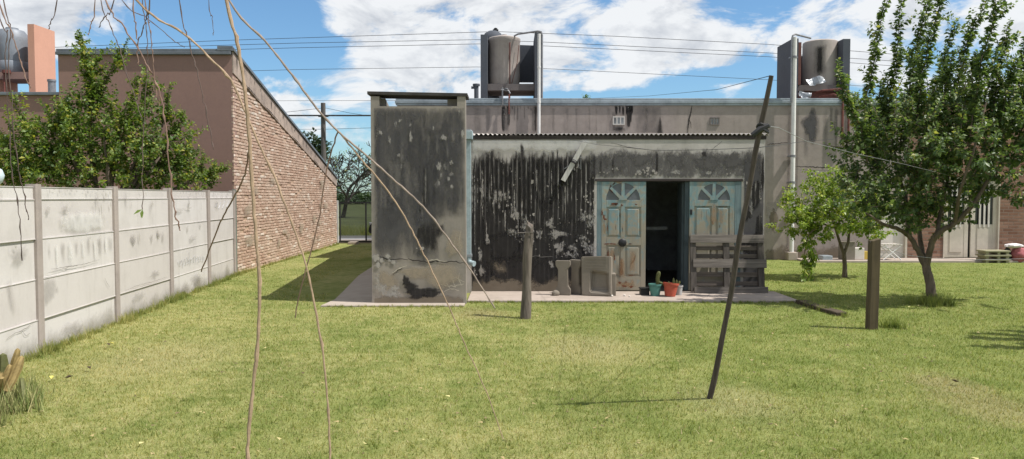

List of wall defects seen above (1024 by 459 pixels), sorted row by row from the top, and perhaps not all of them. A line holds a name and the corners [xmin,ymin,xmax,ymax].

crack [382,233,464,292]
peeling [461,130,619,268]
water stain [374,106,838,303]
rust [601,181,637,288]